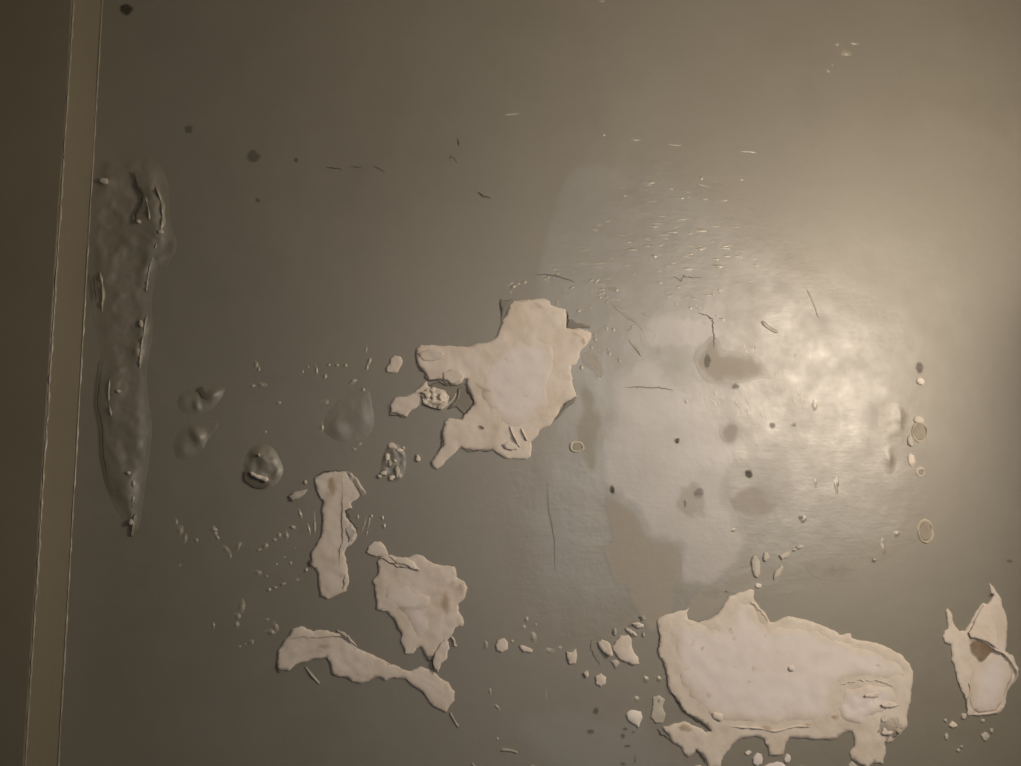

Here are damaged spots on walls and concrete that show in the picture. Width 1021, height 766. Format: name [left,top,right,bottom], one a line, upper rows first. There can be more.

peeling [377,298,601,482]
water stain [507,156,925,640]
peeling [287,470,366,600]
peeling [276,542,467,712]
peeling [566,544,913,766]
peeling [942,583,1019,741]